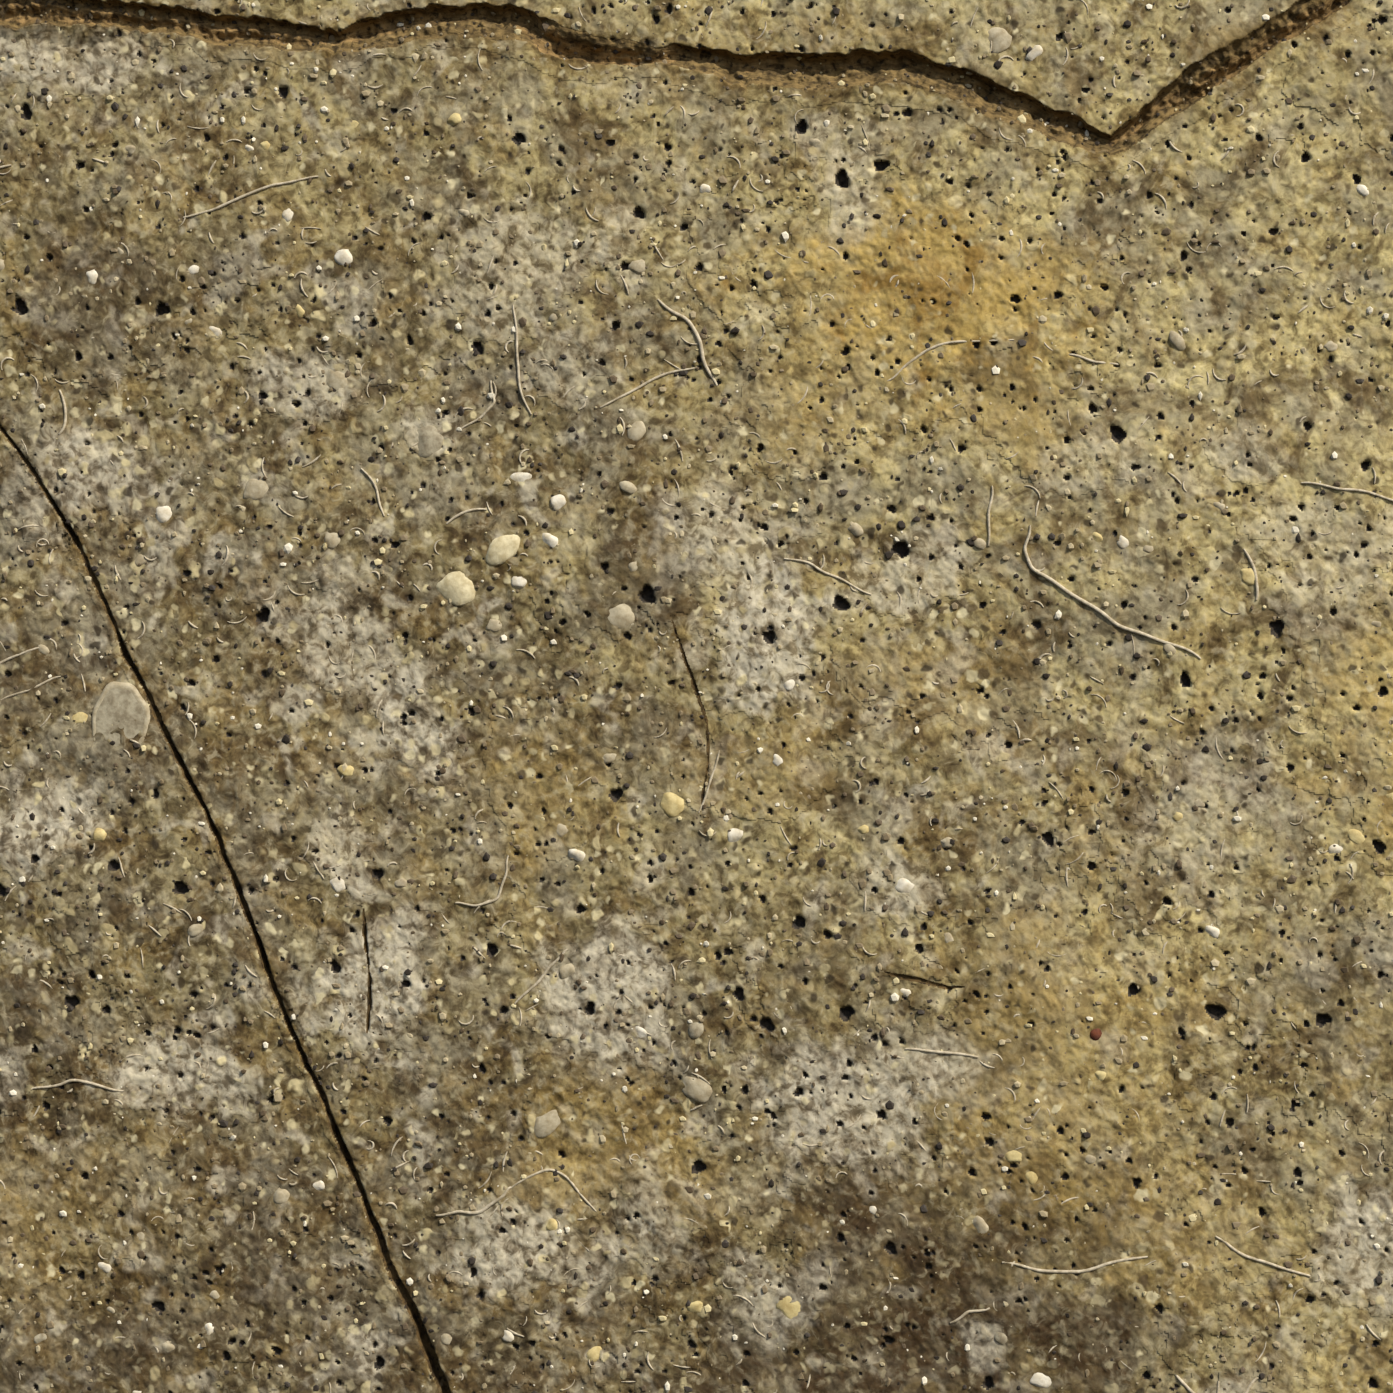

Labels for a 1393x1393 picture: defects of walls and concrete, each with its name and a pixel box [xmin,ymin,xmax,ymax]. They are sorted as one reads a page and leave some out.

crack [0,0,1372,173]
crack [0,413,451,1393]